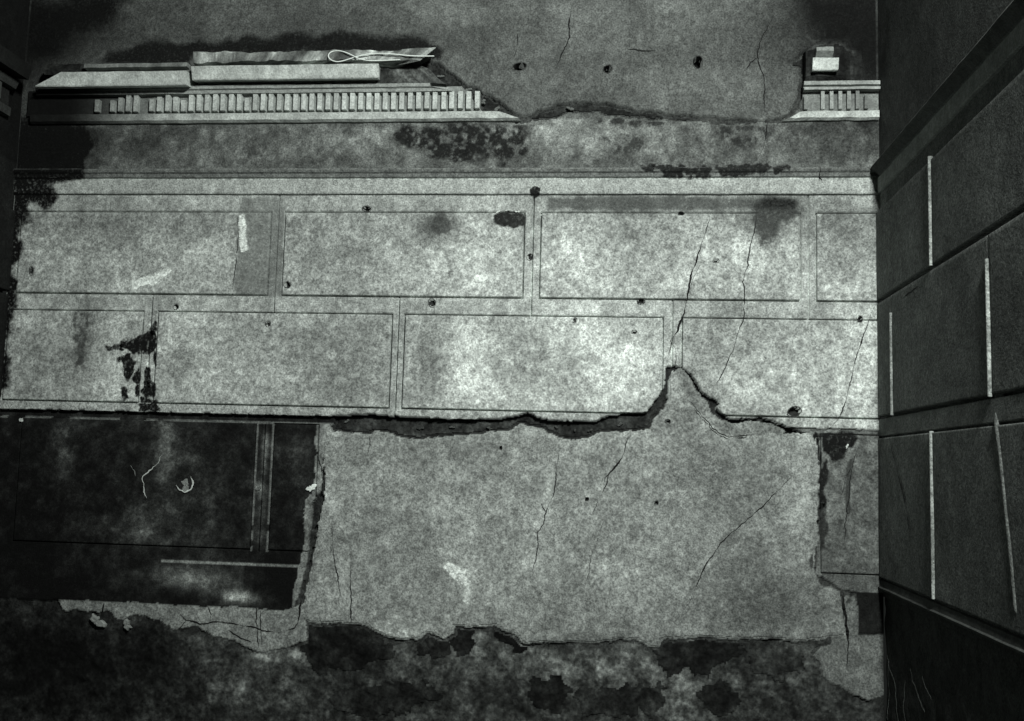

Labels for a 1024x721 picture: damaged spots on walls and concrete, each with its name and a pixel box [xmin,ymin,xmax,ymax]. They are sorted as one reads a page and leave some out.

flaking render [419,62,516,117]
flaking render [532,105,663,119]
leakage [393,122,527,167]
leakage [641,163,791,180]
leakage [753,197,797,244]
crack [668,220,710,363]
crack [712,217,757,389]
crack [832,308,874,426]
flaking render [336,393,665,437]
crack [532,448,560,576]
crack [678,480,788,624]
leakage [371,620,420,637]